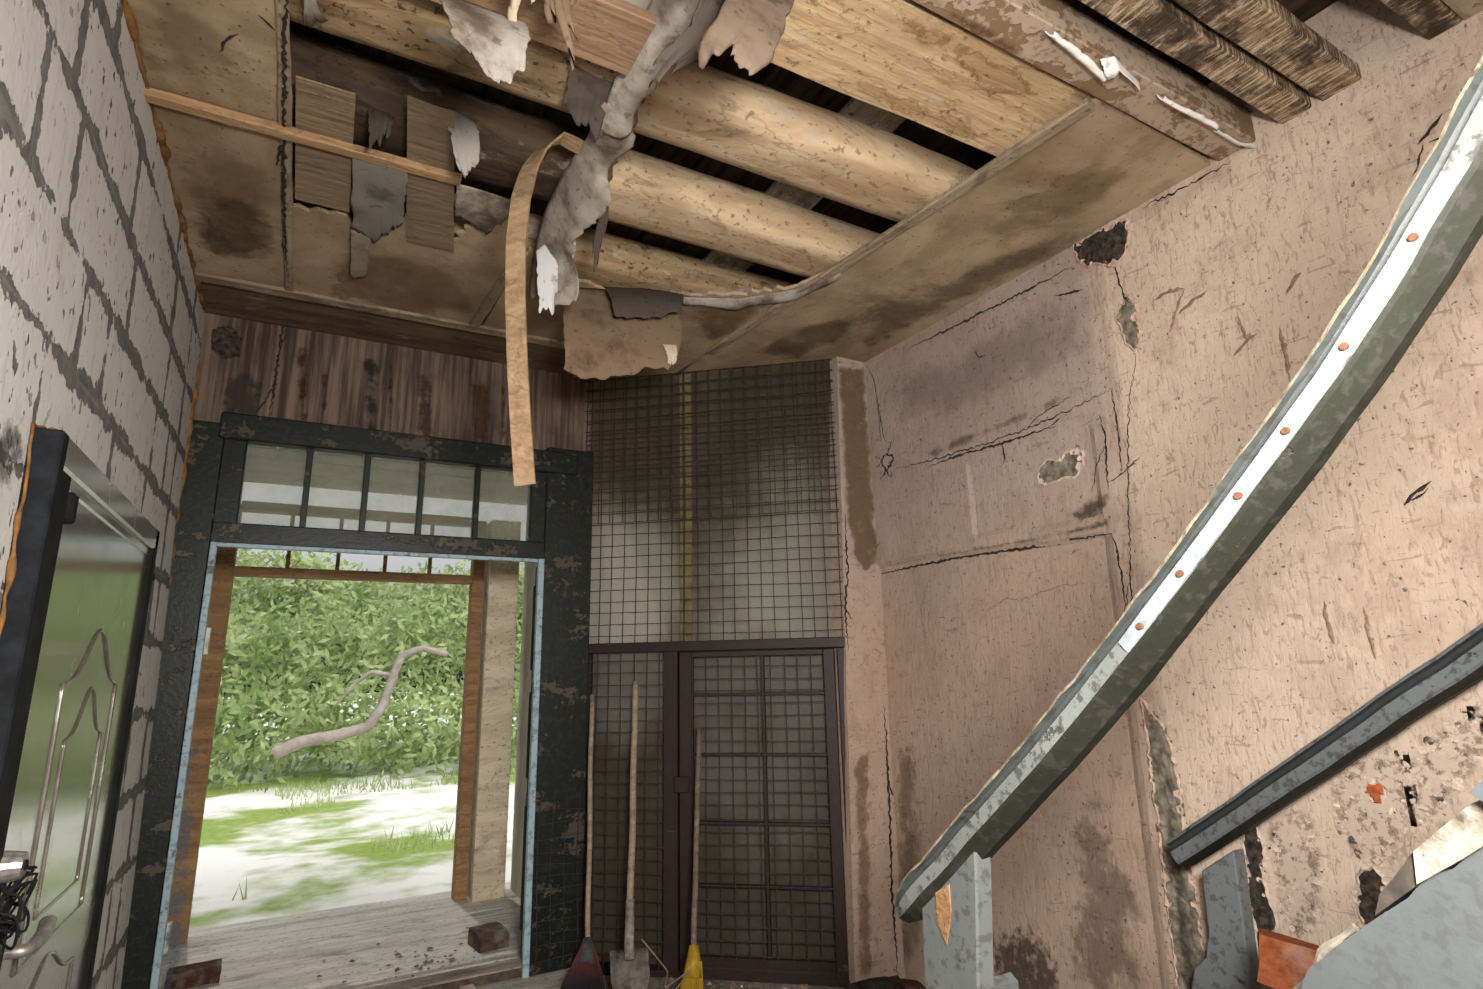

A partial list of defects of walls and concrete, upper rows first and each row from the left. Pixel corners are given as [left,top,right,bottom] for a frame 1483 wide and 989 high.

flaking render [1072,218,1131,269]
crack [1115,267,1131,309]
flaking render [1037,447,1085,486]
crack [844,354,1139,649]
peeling [1242,703,1483,964]